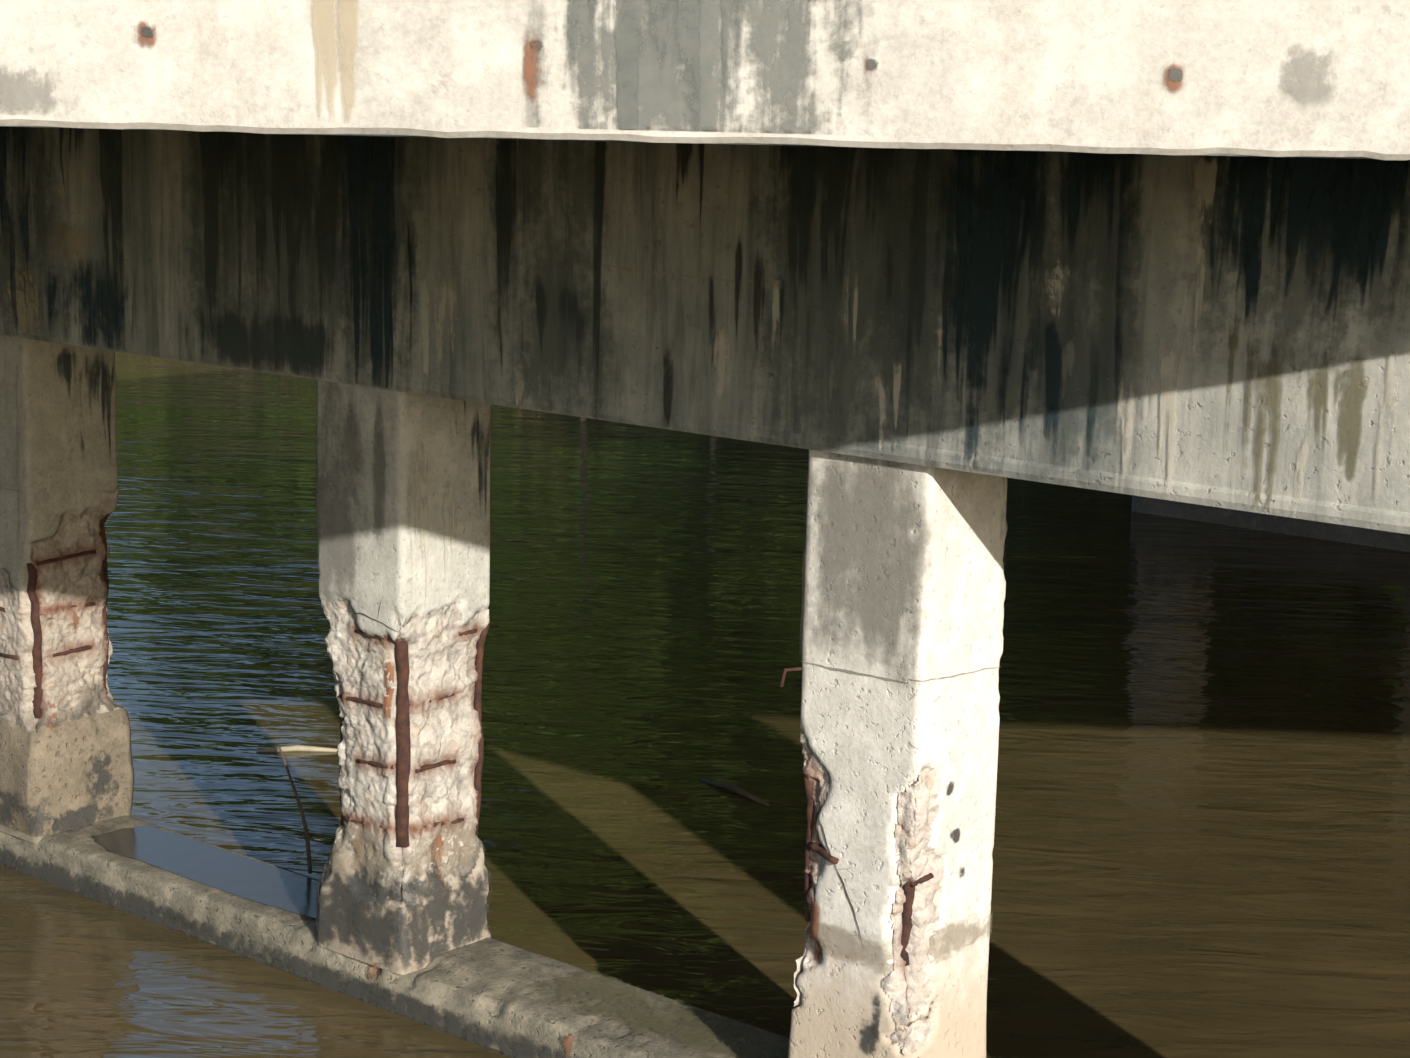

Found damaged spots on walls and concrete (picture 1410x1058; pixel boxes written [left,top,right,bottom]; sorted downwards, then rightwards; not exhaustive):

damp [0,73,135,447]
damp [199,131,456,390]
damp [536,0,894,414]
damp [875,149,1140,467]
corrosion [1165,65,1183,91]
damp [1194,155,1410,512]
spalling [0,487,122,736]
corrosion [383,662,394,717]
spalling [321,598,490,904]
corrosion [809,895,820,962]
spalling [794,729,839,1006]
spalling [881,766,965,1056]